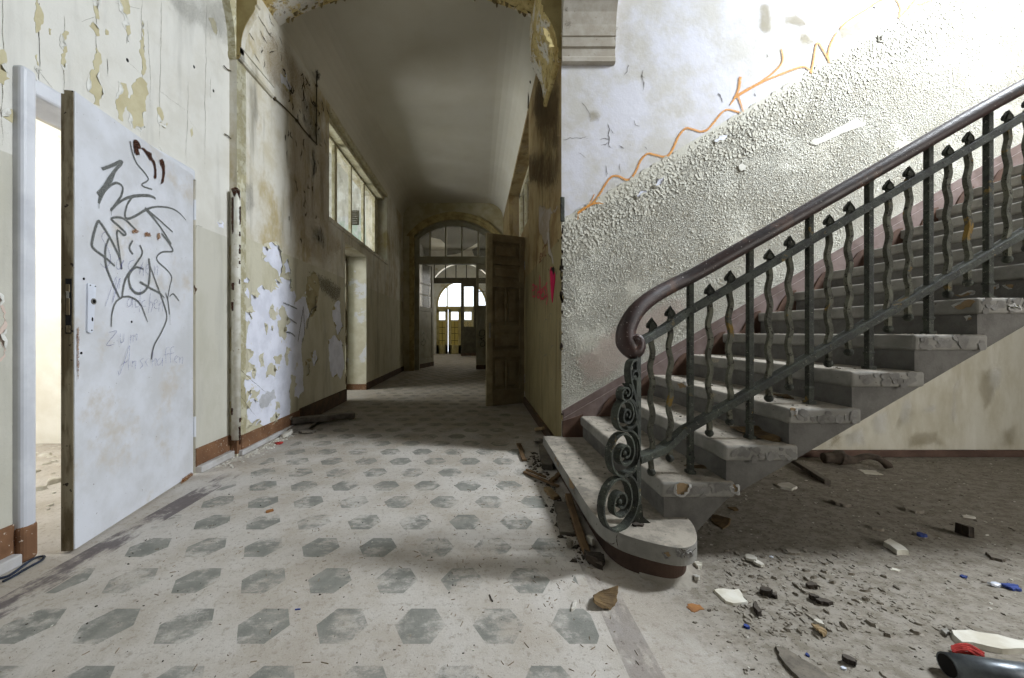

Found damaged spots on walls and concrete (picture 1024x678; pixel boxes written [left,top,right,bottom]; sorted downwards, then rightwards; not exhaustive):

peeling [34,0,69,70]
peeling [86,0,168,132]
crack [566,103,647,172]
peeling [539,0,1024,421]
peeling [244,241,345,429]